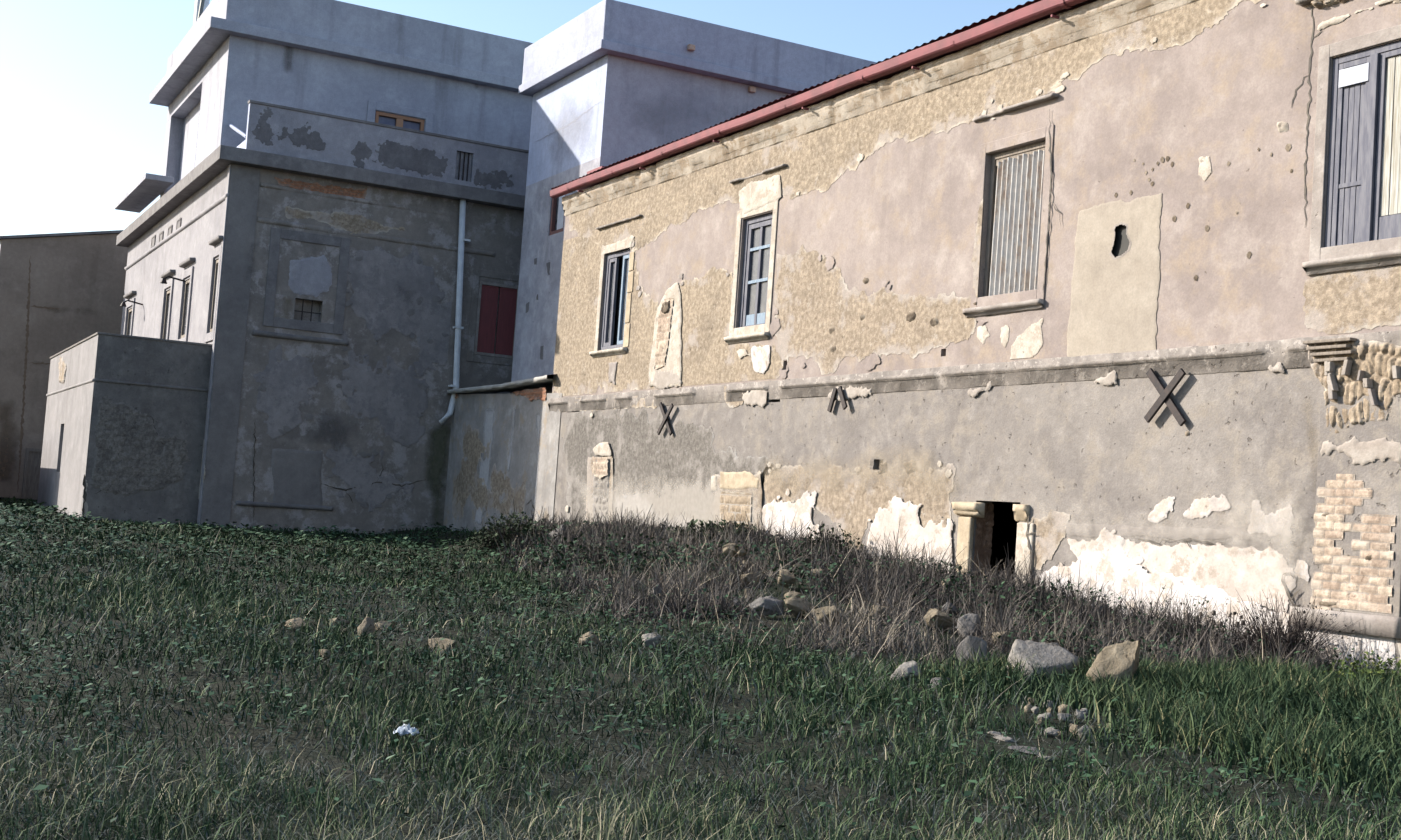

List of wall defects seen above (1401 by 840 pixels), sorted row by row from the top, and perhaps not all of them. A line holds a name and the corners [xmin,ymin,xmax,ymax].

flaking render [1311,0,1373,31]
peeling [252,107,326,151]
spalling [1257,121,1291,156]
crack [1291,4,1322,226]
peeling [474,169,514,190]
flaking render [513,0,1266,574]
flaking render [1303,265,1401,334]
flaking render [1268,362,1285,373]
flaking render [1031,436,1401,671]